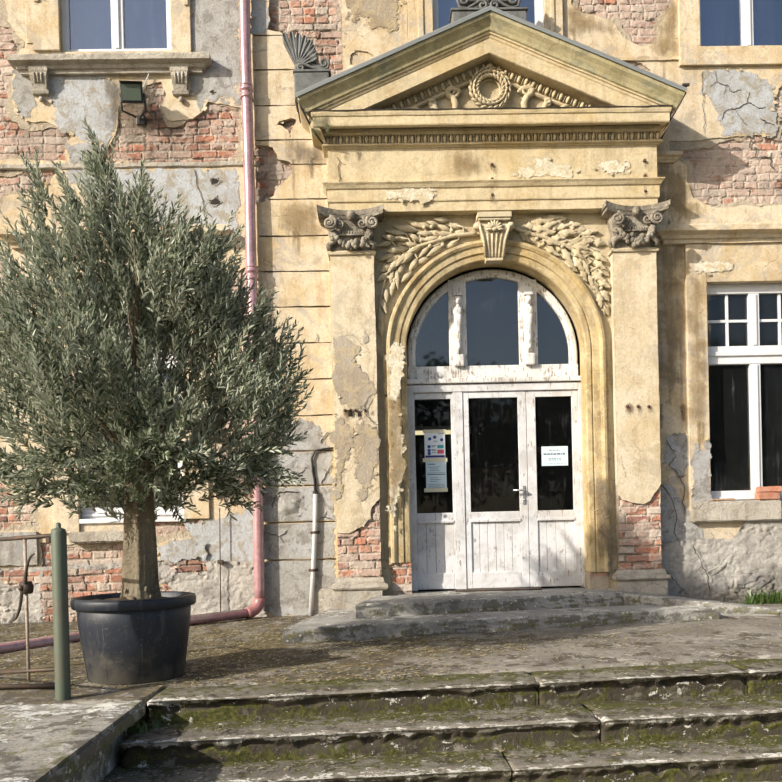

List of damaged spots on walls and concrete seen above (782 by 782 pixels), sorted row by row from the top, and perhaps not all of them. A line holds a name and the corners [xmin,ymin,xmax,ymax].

spalling [250,0,407,75]
spalling [0,0,242,244]
spalling [254,147,292,204]
spalling [279,121,296,134]
spalling [674,68,782,207]
crack [702,71,782,171]
spalling [0,543,53,622]
spalling [67,543,123,622]
peeling [155,507,253,574]
peeling [263,331,407,616]
spalling [618,432,713,570]
crack [661,440,723,597]